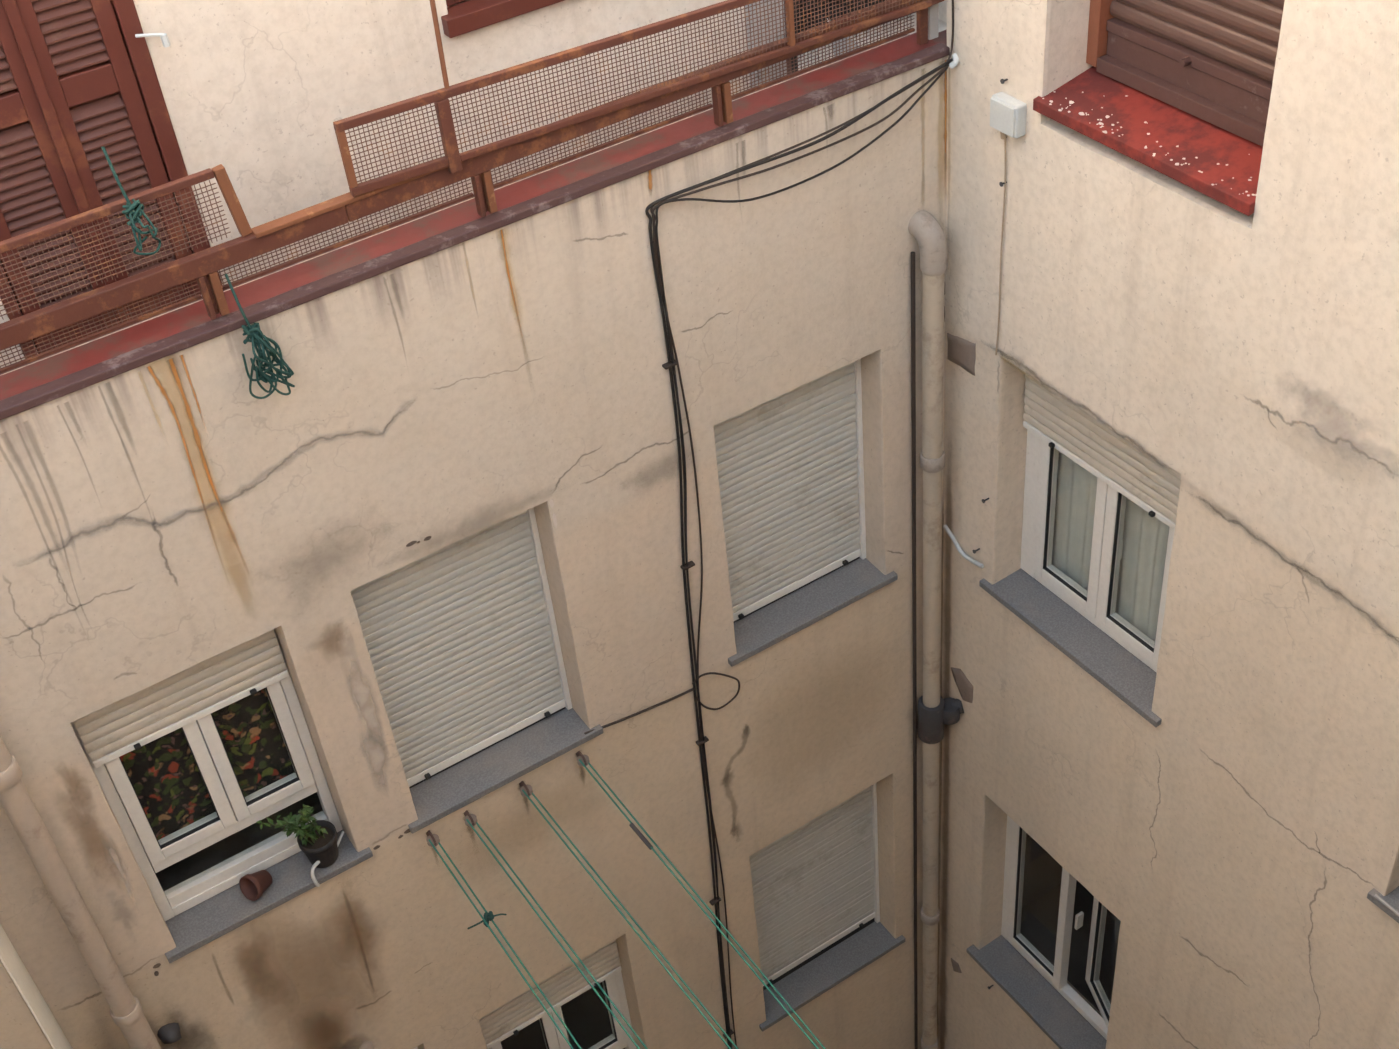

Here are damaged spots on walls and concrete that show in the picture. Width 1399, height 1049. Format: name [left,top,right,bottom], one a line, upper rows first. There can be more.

peeling [1042,91,1123,137]
peeling [1144,121,1256,196]
corrosion [501,230,517,312]
corrosion [147,355,226,519]